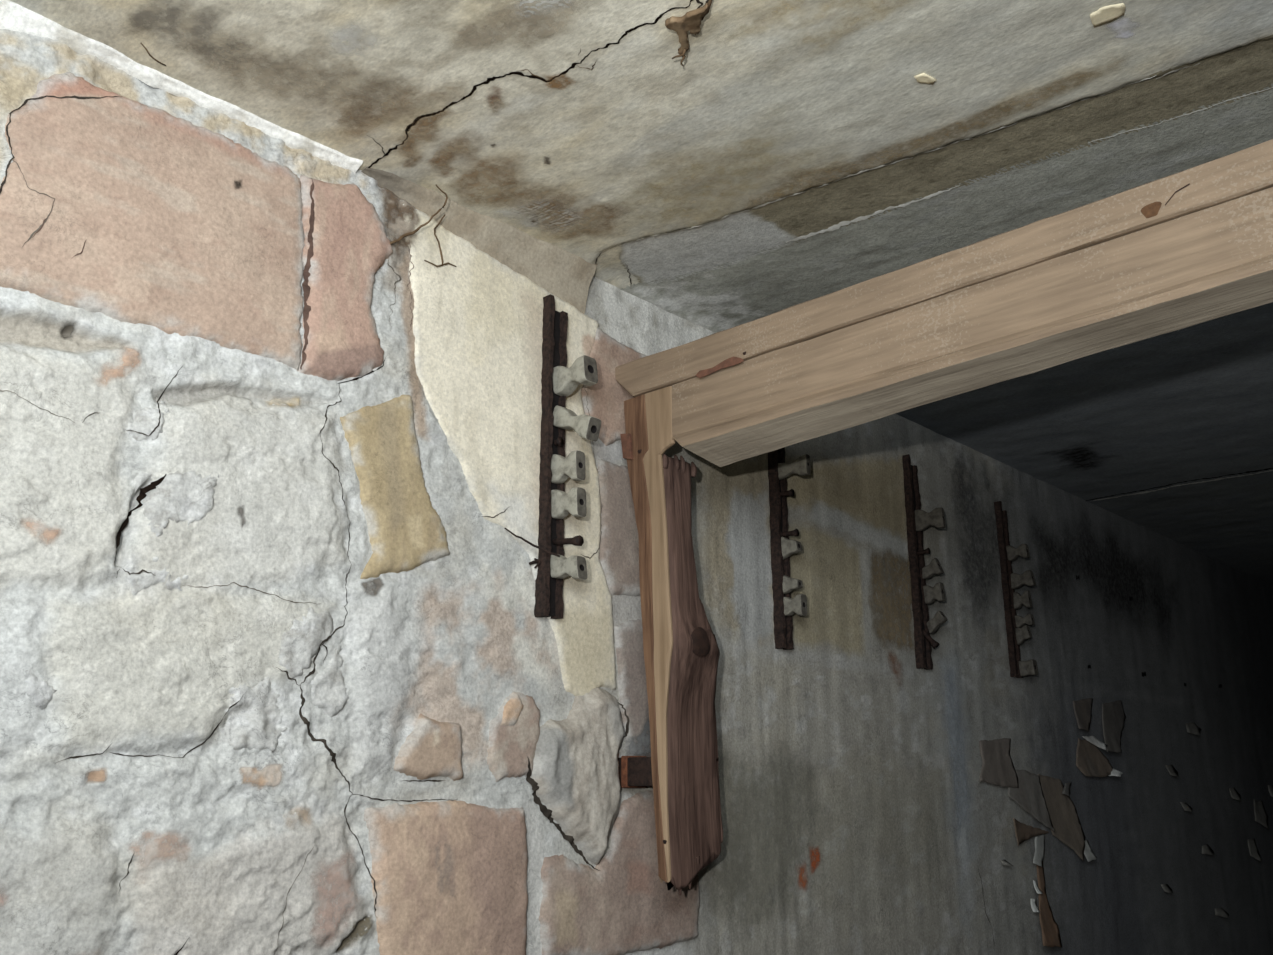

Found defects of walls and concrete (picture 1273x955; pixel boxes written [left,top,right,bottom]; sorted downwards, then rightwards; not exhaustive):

crack [0,95,123,246]
leakage [131,3,413,132]
leakage [457,160,616,237]
crack [366,0,709,168]
leakage [547,75,573,88]
leakage [751,73,1100,207]
flaking render [595,35,1273,333]
flaking render [1090,3,1126,27]
crack [388,241,414,336]
peeling [129,470,219,538]
crack [188,360,458,916]
peeling [979,698,1123,947]